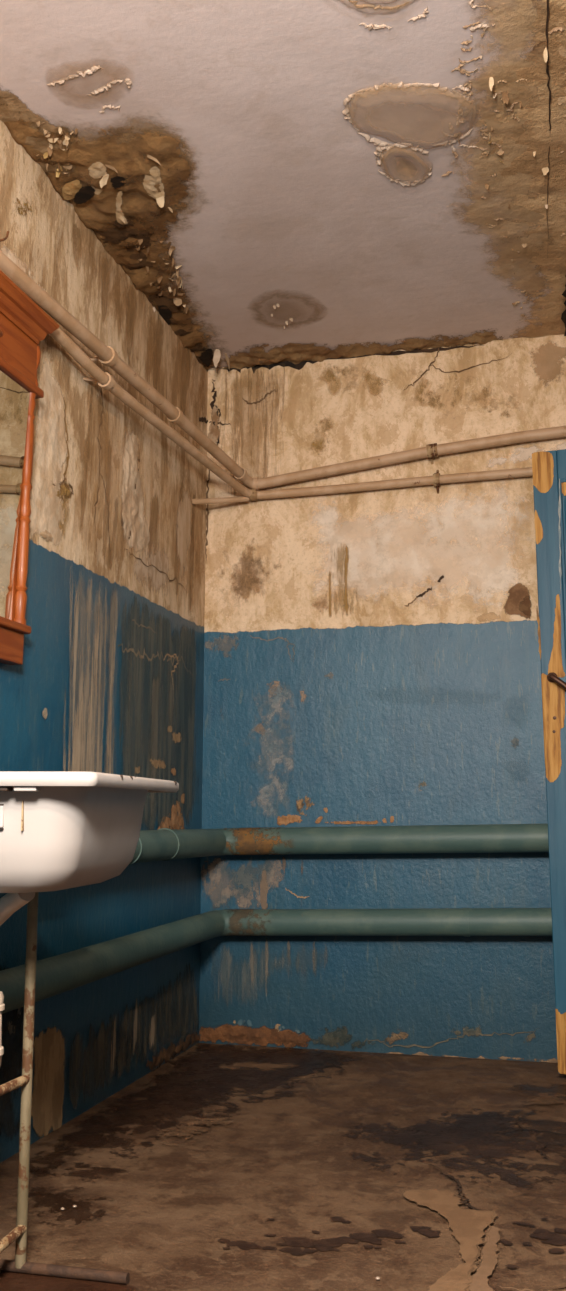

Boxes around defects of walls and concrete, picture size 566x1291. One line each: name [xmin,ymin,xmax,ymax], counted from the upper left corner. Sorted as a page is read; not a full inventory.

crack [530,0,551,258]
leakage [232,545,259,598]
leakage [63,571,196,830]
corrosion [224,827,290,855]
leakage [342,1083,566,1188]
crack [428,1164,566,1291]